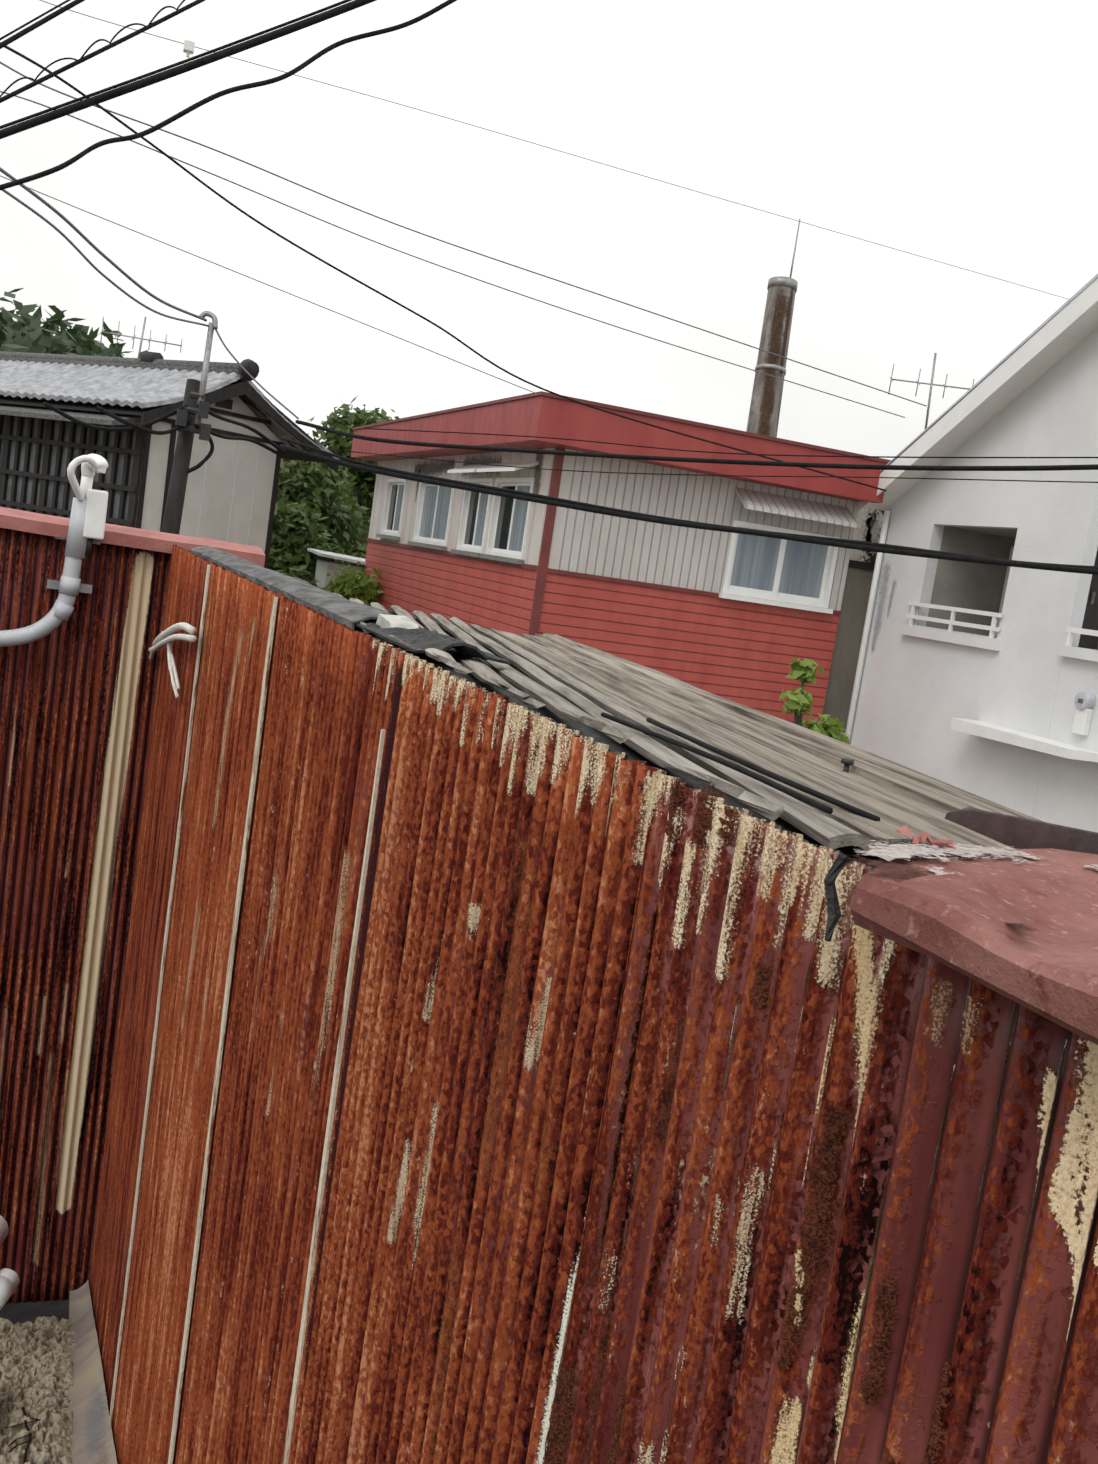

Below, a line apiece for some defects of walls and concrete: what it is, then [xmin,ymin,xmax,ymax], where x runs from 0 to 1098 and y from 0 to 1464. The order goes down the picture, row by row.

rust [665,778,742,847]
rust [304,664,404,1378]
rust [590,910,658,1290]
rust [648,1014,686,1155]
peeling [371,640,1056,1204]
rust [824,914,852,1062]
peeling [387,1102,439,1273]
rust [774,1087,852,1374]
peeling [1017,1038,1098,1348]
rust [542,1321,628,1464]
peeling [764,1348,817,1464]
rust [859,1274,900,1414]